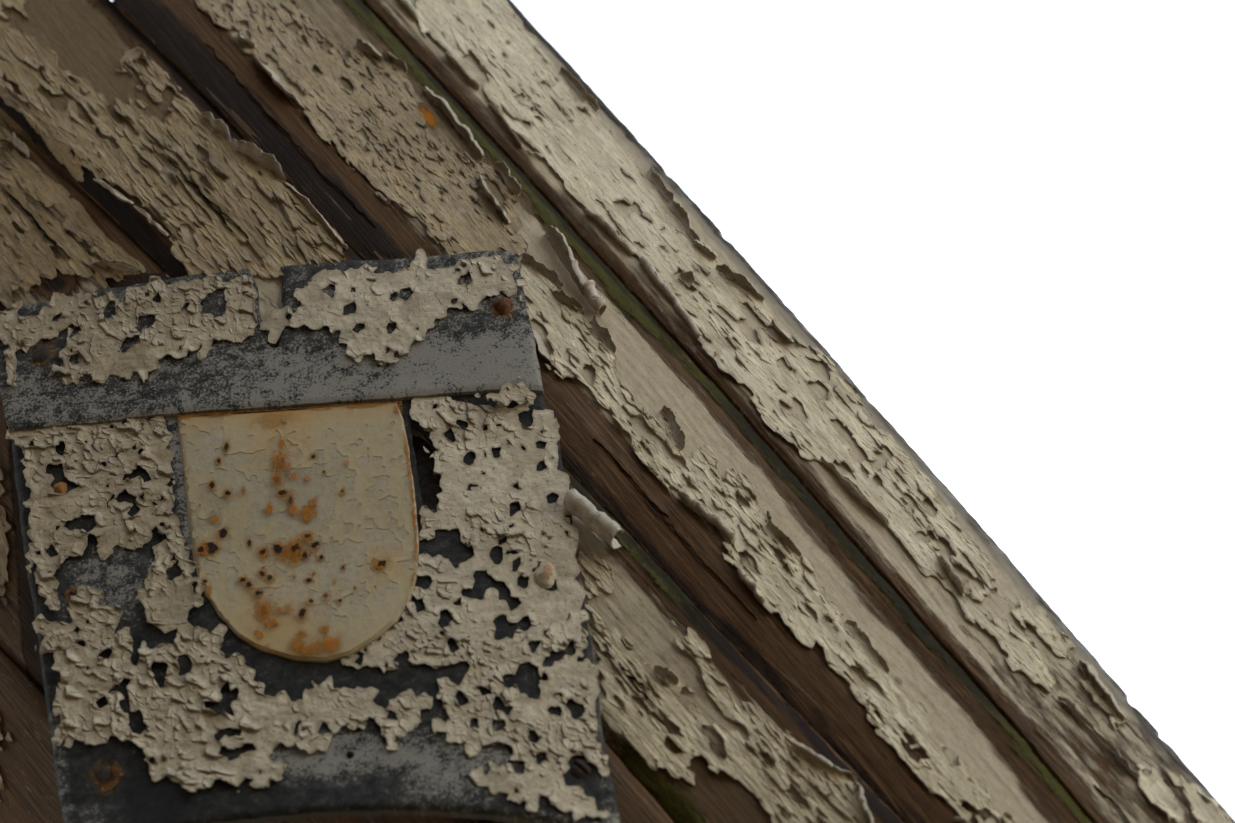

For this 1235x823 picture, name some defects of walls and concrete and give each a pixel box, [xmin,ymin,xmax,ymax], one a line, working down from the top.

peeling [0,0,348,386]
peeling [0,469,12,605]
rust [197,515,228,555]
rust [208,480,246,497]
rust [177,401,403,418]
rust [238,440,346,654]
peeling [5,375,874,823]
peeling [399,0,1233,823]